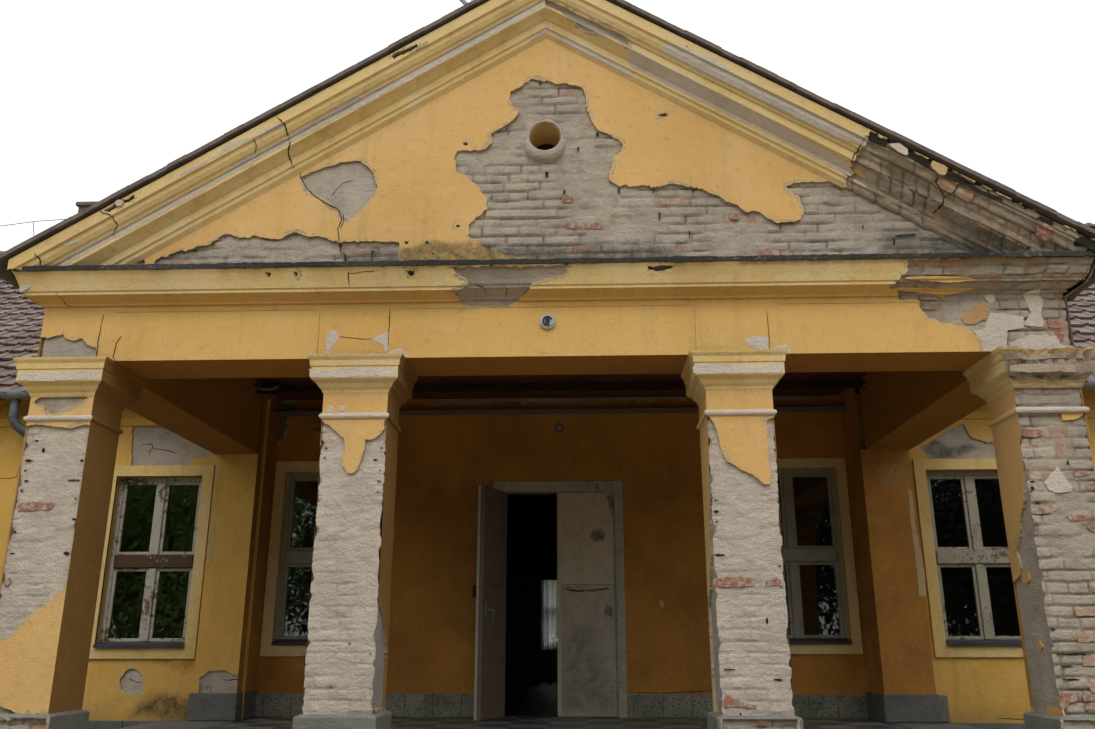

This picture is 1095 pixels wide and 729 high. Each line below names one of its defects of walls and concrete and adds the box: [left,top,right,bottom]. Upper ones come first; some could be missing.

crack [277,117,374,286]
flaking render [58,0,1095,351]
crack [933,177,957,214]
flaking render [0,397,90,640]
flaking render [132,426,221,571]
flaking render [302,405,387,714]
peeling [307,330,397,378]
peeling [693,336,791,374]
flaking render [707,417,796,729]
flaking render [920,425,996,459]
peeling [1010,363,1076,372]
flaking render [1014,387,1095,729]